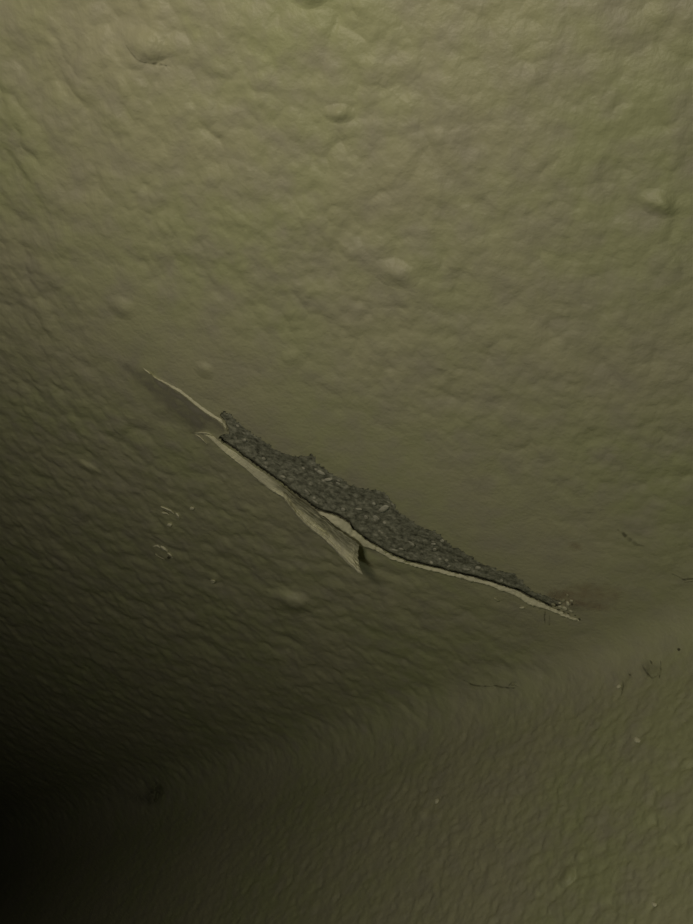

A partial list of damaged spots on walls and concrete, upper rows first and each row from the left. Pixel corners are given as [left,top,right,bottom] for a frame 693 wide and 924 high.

peeling [144,369,581,621]